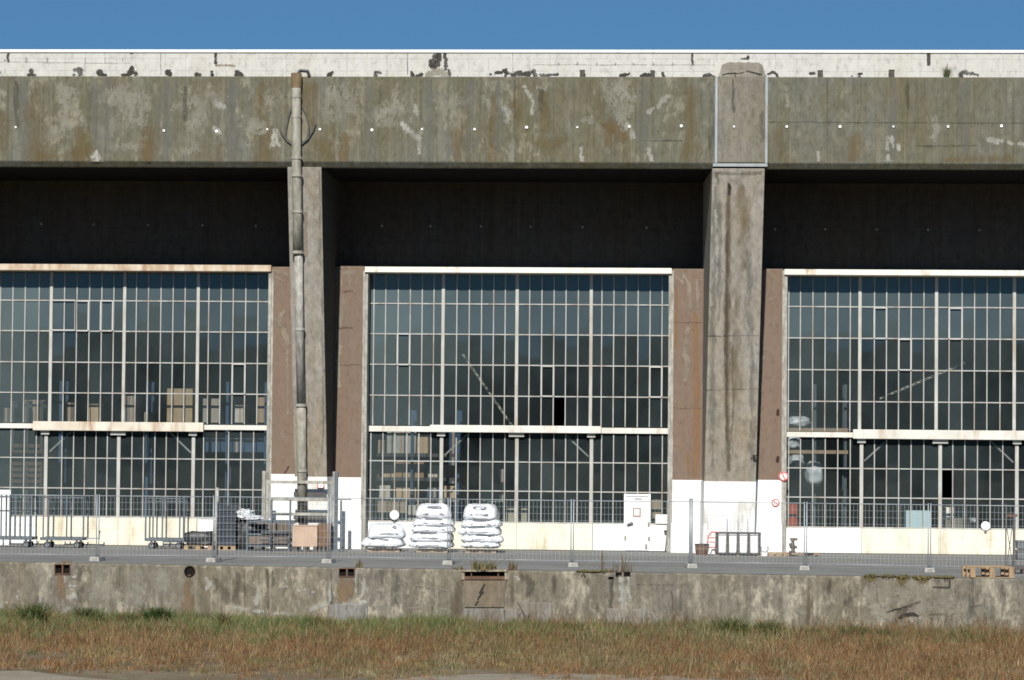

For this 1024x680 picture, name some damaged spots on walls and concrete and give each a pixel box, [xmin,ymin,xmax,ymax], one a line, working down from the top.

spalling [410,53,451,77]
peeling [245,89,308,148]
spalling [489,68,559,115]
peeling [603,72,667,139]
peeling [880,136,901,162]